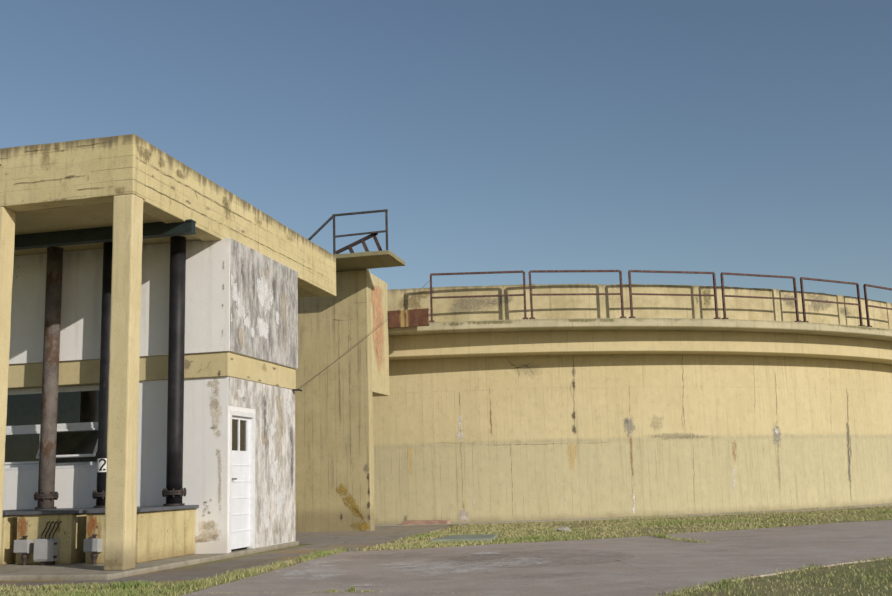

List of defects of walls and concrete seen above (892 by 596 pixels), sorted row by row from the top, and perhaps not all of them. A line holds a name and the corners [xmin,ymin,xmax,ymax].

peeling [207,372,296,548]
crack [510,363,576,501]